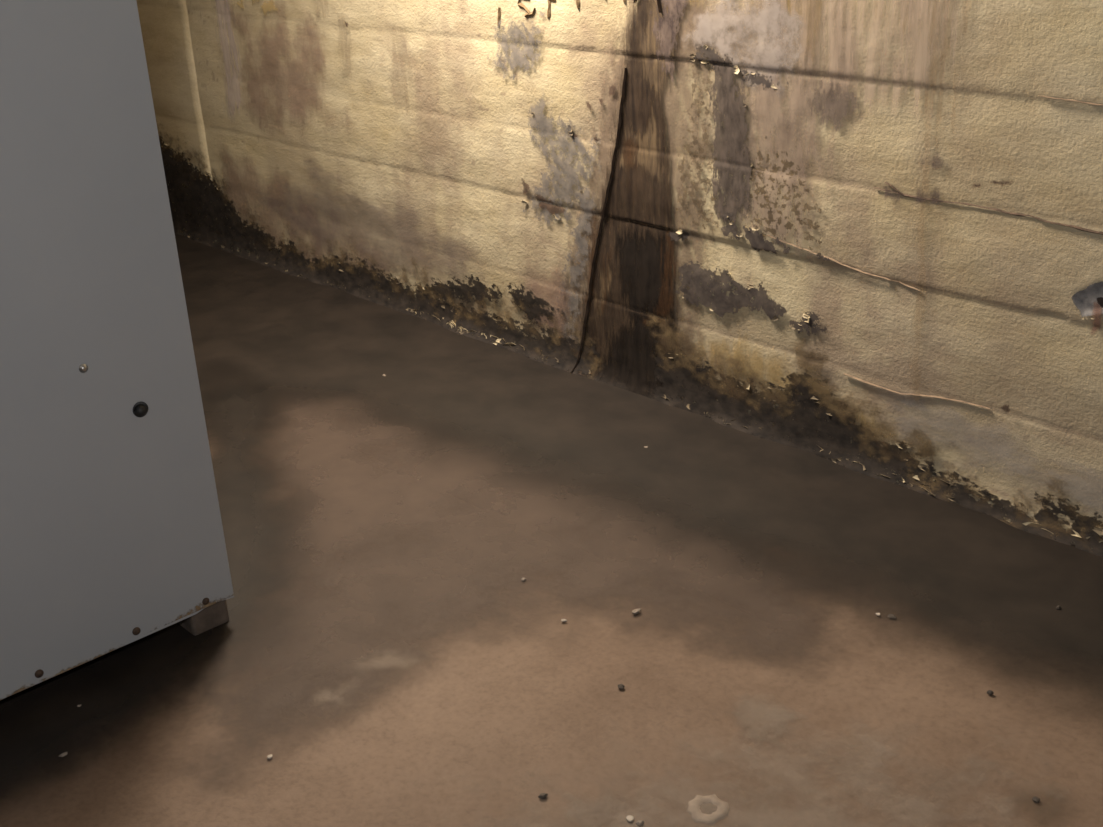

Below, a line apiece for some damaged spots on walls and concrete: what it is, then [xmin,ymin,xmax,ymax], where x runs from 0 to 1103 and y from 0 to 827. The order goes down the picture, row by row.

leakage [0,233,1103,800]
leakage [557,182,602,341]
leakage [584,0,711,399]
leakage [741,0,948,250]
spalling [646,261,1103,557]
crack [874,182,1103,235]